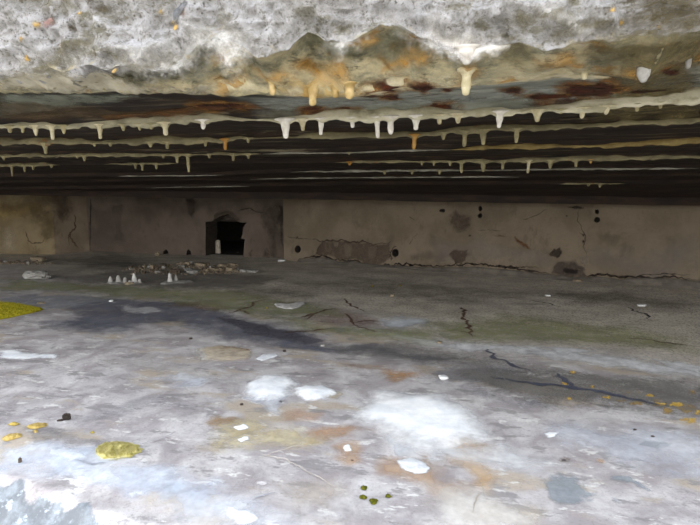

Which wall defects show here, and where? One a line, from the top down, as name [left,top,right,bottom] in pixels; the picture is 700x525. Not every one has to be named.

water stain [4,72,144,95]
corrosion [186,78,256,114]
corrosion [297,106,325,115]
water stain [0,87,700,167]
corrosion [364,77,450,101]
corrosion [496,77,667,105]
water stain [265,137,700,179]
crack [384,262,549,274]
crack [584,272,692,280]
crack [283,298,376,333]
water stain [0,295,700,414]
crack [460,307,668,406]